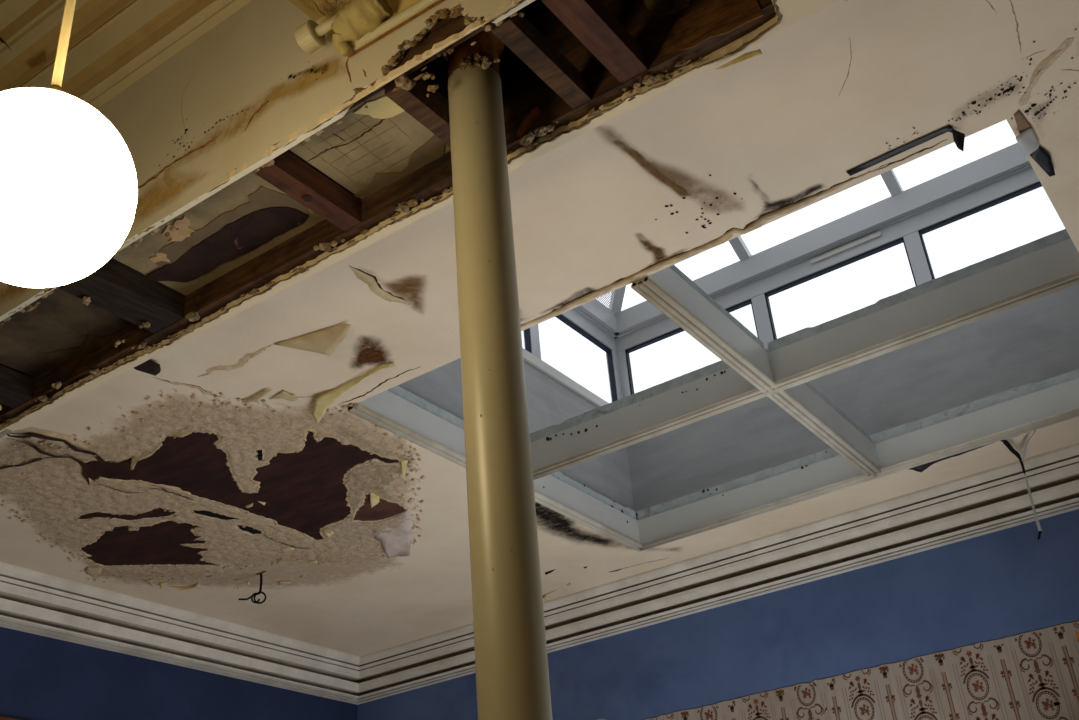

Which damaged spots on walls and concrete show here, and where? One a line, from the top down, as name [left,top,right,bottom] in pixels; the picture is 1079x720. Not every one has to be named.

spalling [284,0,526,147]
peeling [507,0,783,164]
mould [948,58,1076,122]
crack [986,0,1079,83]
leakage [136,61,339,216]
leakage [614,137,703,215]
leakage [765,185,822,211]
leakage [0,285,27,298]
peeling [0,186,453,590]
leakage [535,503,606,543]